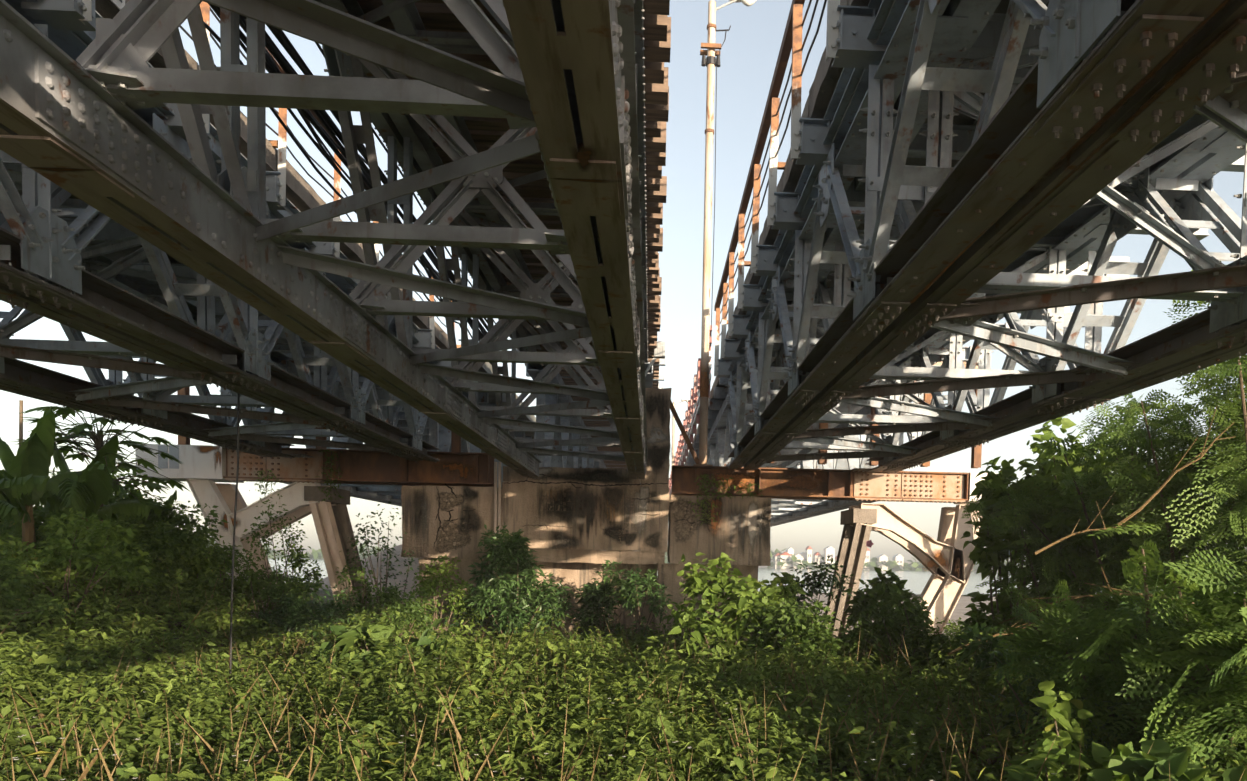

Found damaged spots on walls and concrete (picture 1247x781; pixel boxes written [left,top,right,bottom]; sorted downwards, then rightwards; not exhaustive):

water stain [541,468,660,548]
water stain [725,503,770,552]